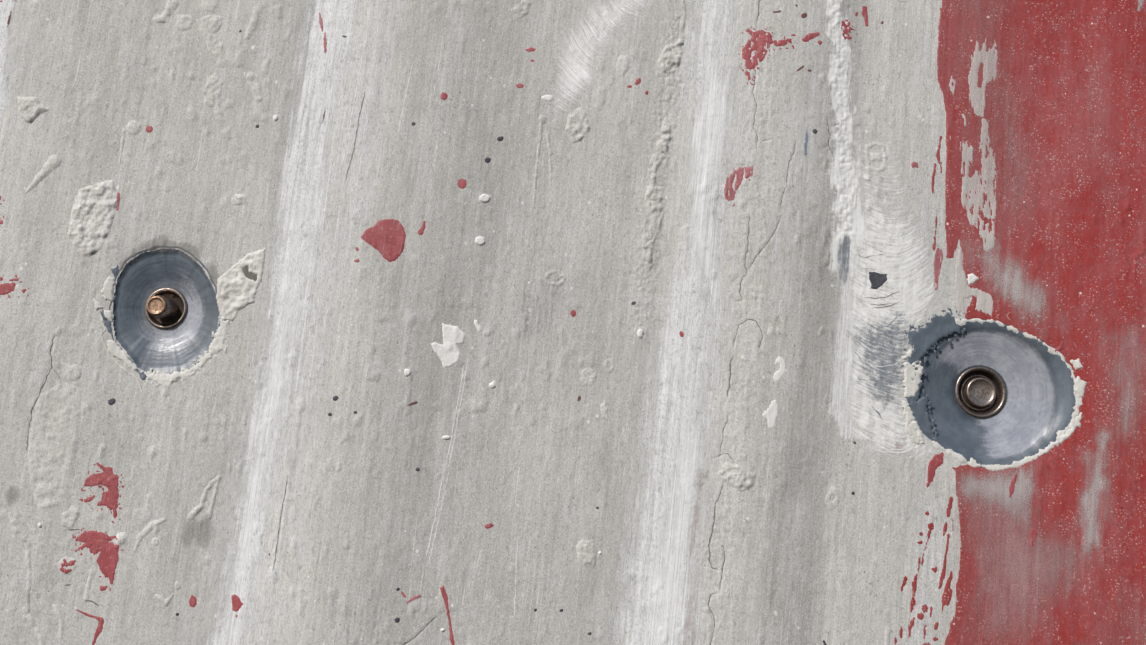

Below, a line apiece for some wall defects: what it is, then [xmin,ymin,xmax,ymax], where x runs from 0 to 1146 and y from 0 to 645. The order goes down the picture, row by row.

peeling [949,38,998,252]
peeling [901,247,1087,471]